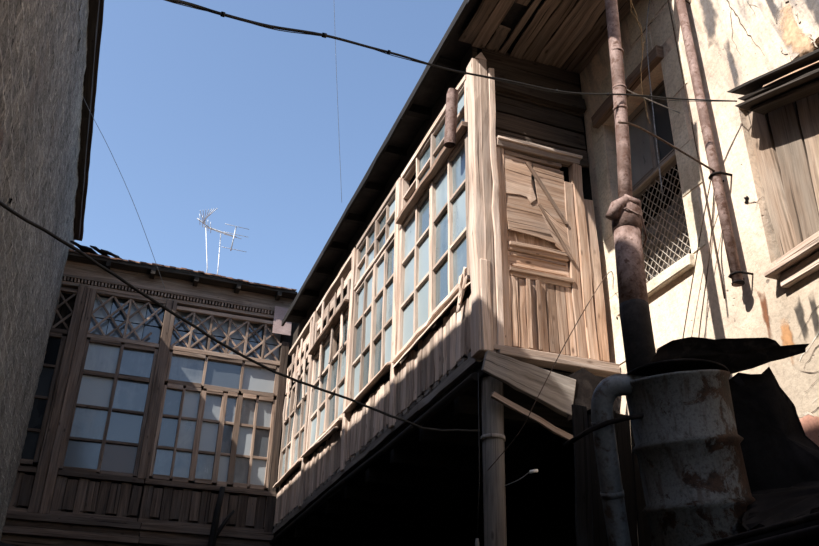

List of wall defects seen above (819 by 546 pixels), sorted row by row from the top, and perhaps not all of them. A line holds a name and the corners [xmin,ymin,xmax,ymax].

crack [727,0,765,56]
corrosion [759,294,770,337]
corrosion [781,324,794,346]
flaking render [799,411,819,446]